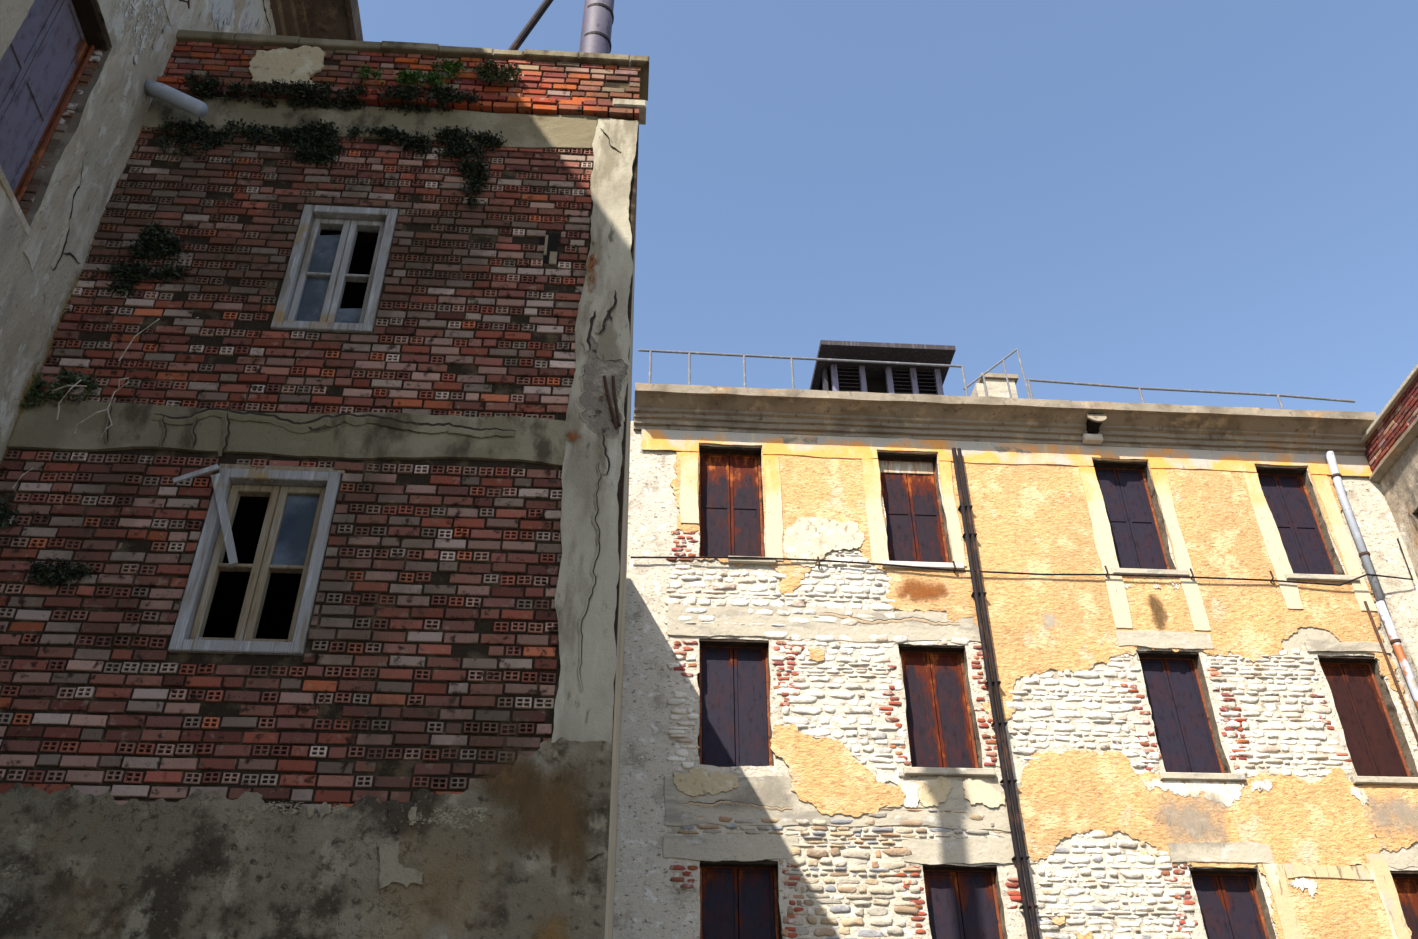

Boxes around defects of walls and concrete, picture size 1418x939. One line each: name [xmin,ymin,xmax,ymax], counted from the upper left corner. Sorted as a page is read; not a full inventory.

peeling [111,0,166,64]
peeling [211,0,276,35]
crack [600,128,621,152]
crack [581,290,617,351]
crack [577,434,610,691]
flaking render [663,530,1378,808]
water stain [486,753,587,875]
flaking render [1003,830,1206,939]